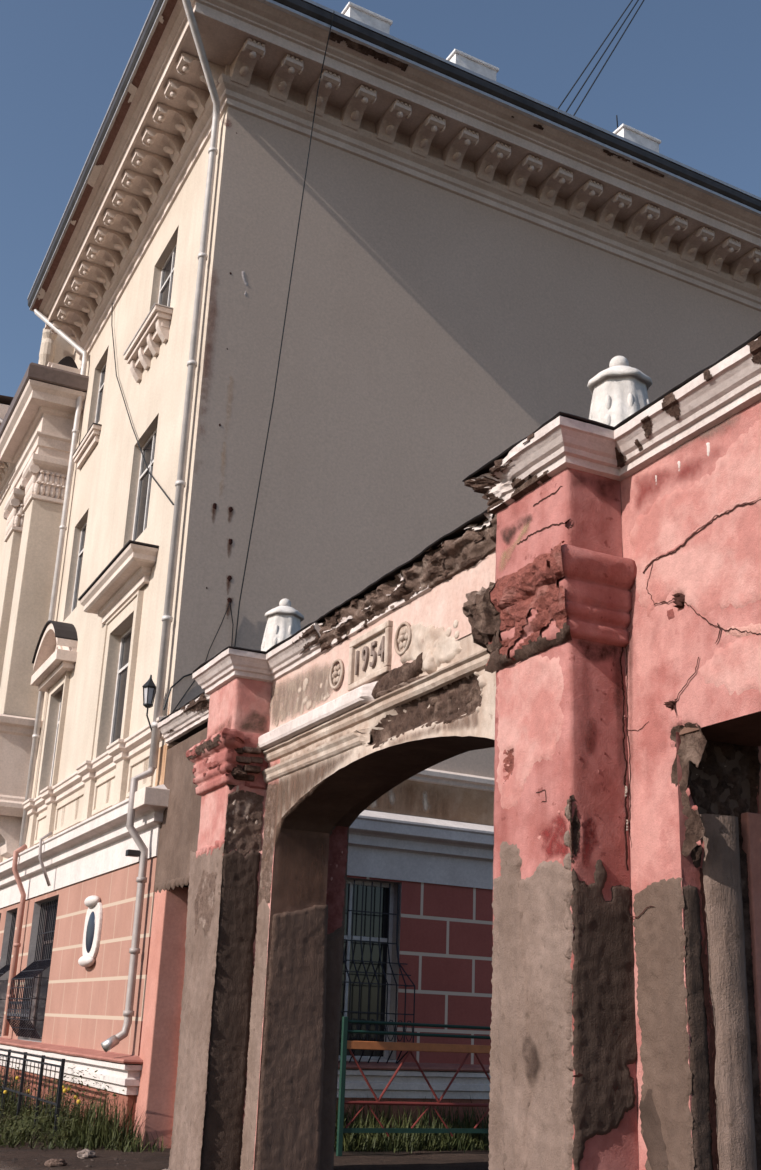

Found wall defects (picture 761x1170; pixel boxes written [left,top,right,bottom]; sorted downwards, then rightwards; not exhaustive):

peeling [748,336,761,364]
peeling [615,447,626,468]
peeling [634,416,651,451]
peeling [661,392,680,420]
crack [517,486,573,545]
flaking render [317,459,551,644]
flaking render [363,541,568,749]
crack [620,496,761,871]
flaking render [187,734,221,760]
flaking render [196,743,277,1170]
flaking render [670,718,761,1170]